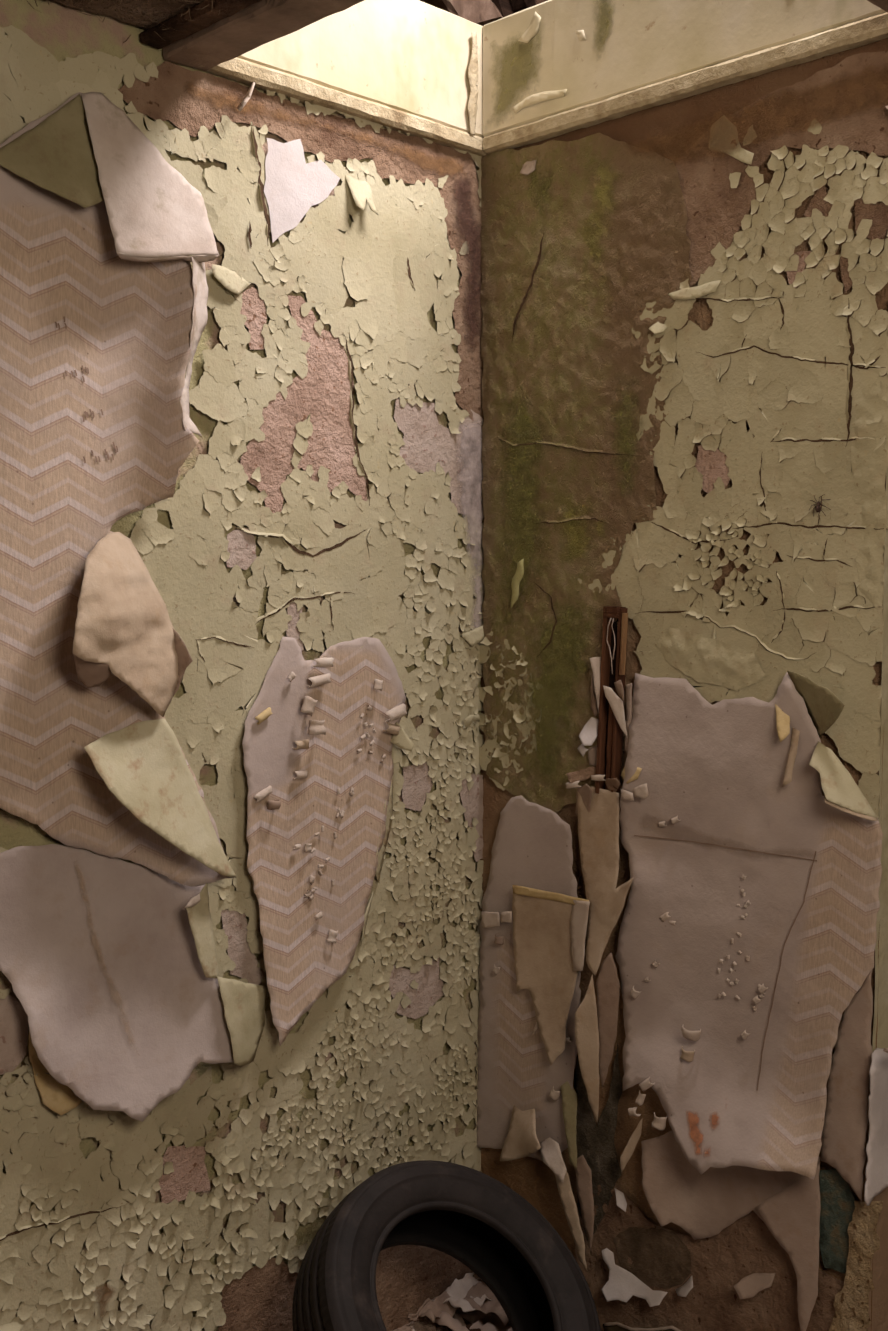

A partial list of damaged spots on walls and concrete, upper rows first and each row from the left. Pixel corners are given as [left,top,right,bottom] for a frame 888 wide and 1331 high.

peeling [511,89,567,113]
flaking render [729,51,888,120]
peeling [0,25,484,573]
crack [638,295,888,660]
flaking render [130,104,888,1225]
peeling [0,988,307,1331]
flaking render [376,1245,479,1331]